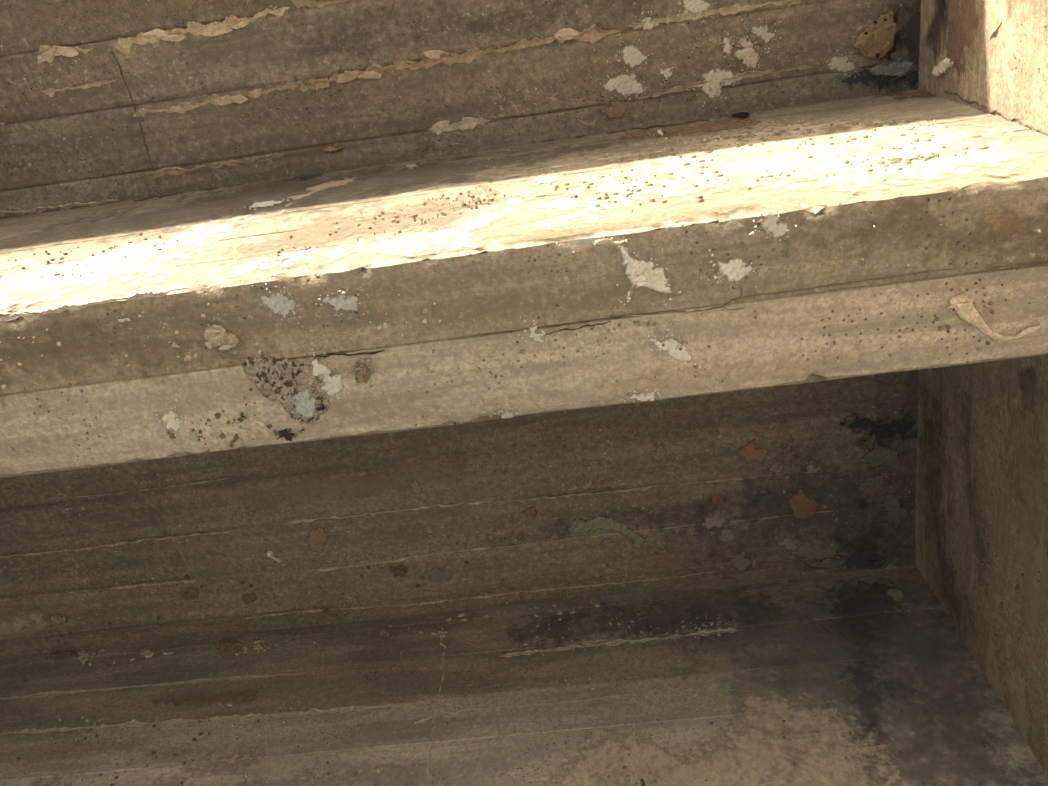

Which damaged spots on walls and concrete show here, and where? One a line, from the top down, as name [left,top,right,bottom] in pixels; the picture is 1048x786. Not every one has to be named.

peeling [142,28,187,42]
peeling [200,20,249,36]
peeling [37,46,79,63]
peeling [336,70,382,83]
peeling [214,89,262,106]
corrosion [618,117,760,139]
peeling [632,276,651,286]
spalling [191,324,329,455]
water stain [840,412,918,526]
water stain [550,526,1040,786]